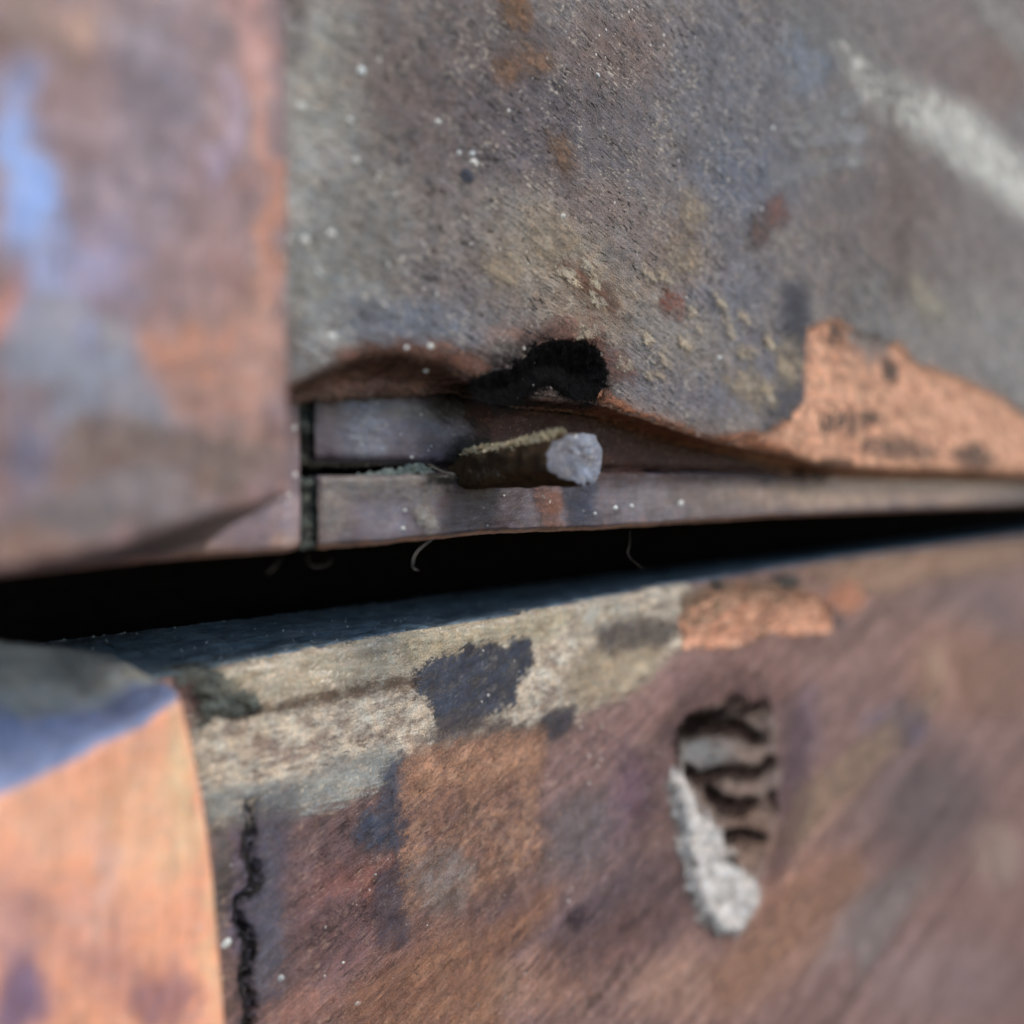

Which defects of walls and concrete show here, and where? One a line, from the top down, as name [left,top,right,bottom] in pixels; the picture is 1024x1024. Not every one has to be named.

spalling [572,316,1024,482]
leakage [411,635,575,753]
peeling [189,572,848,940]
crack [231,803,265,1024]